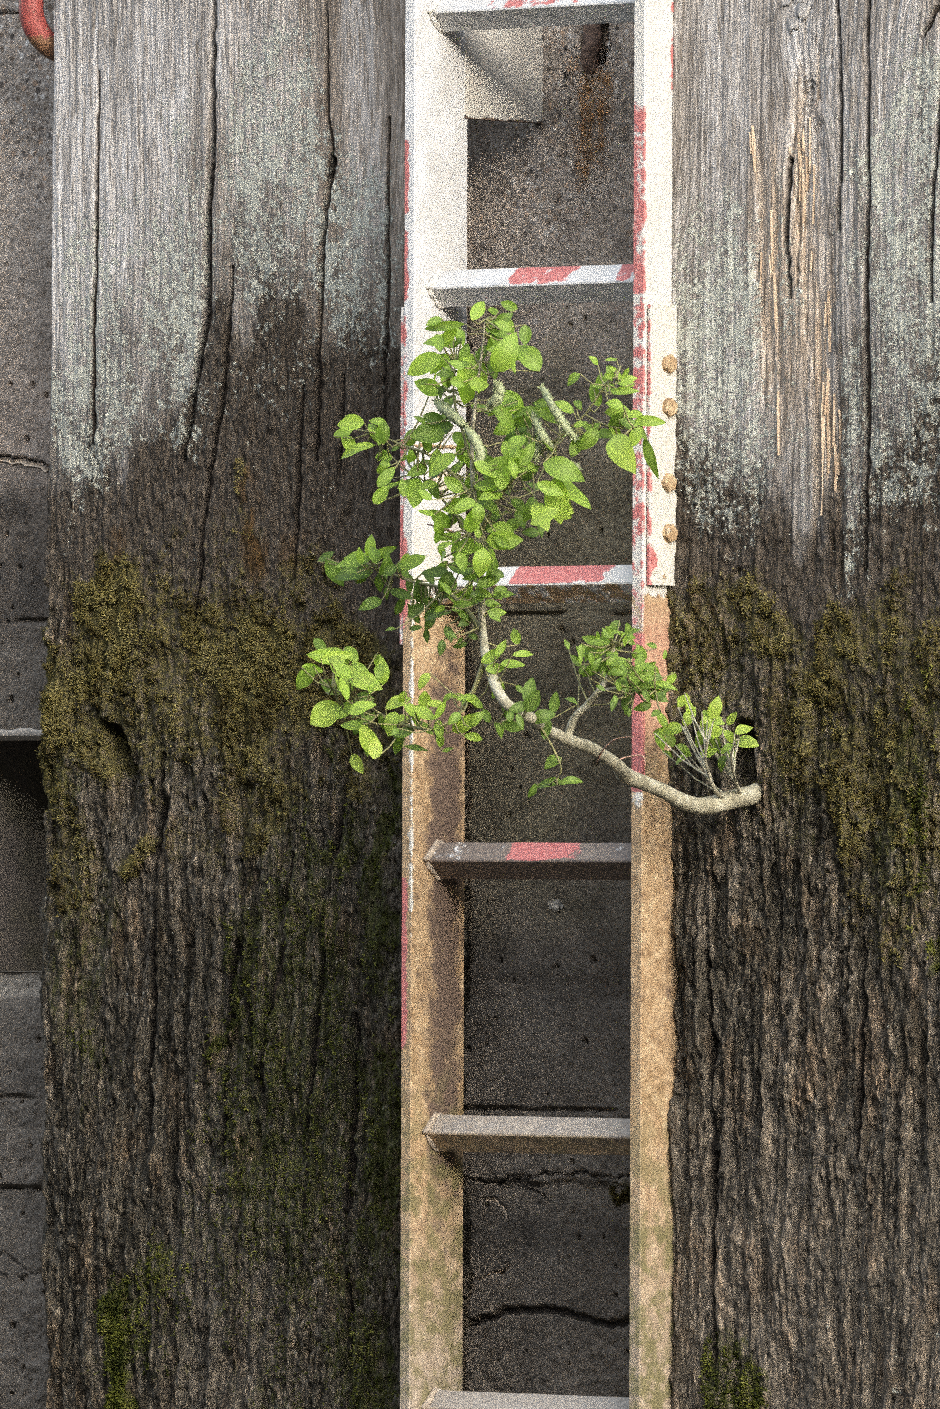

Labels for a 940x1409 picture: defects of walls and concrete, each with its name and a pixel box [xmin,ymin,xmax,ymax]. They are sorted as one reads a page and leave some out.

crack [0,456,50,472]
crack [463,1171,630,1221]